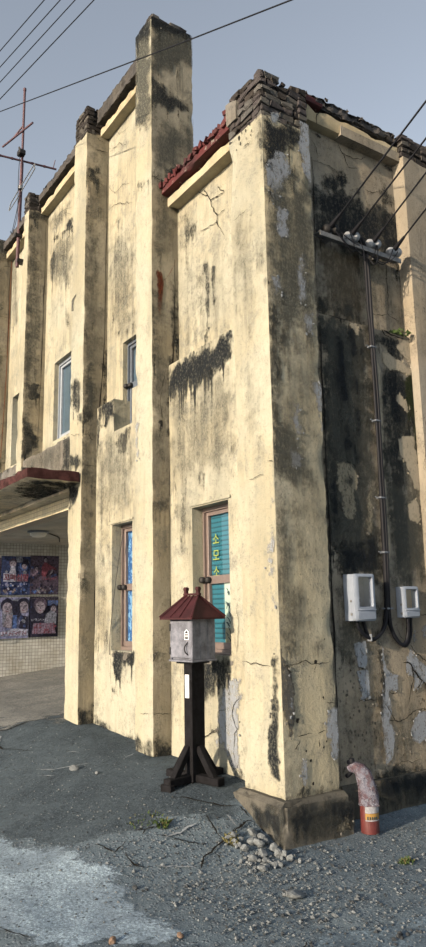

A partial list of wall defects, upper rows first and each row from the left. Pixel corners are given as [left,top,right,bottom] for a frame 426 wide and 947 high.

water stain [148,180,175,269]
crack [184,187,247,235]
peeling [265,121,321,238]
water stain [0,165,133,509]
rust [156,270,164,315]
water stain [152,263,234,489]
water stain [257,116,425,717]
peeling [212,679,242,769]
peeling [323,630,426,771]
water stain [250,786,355,846]